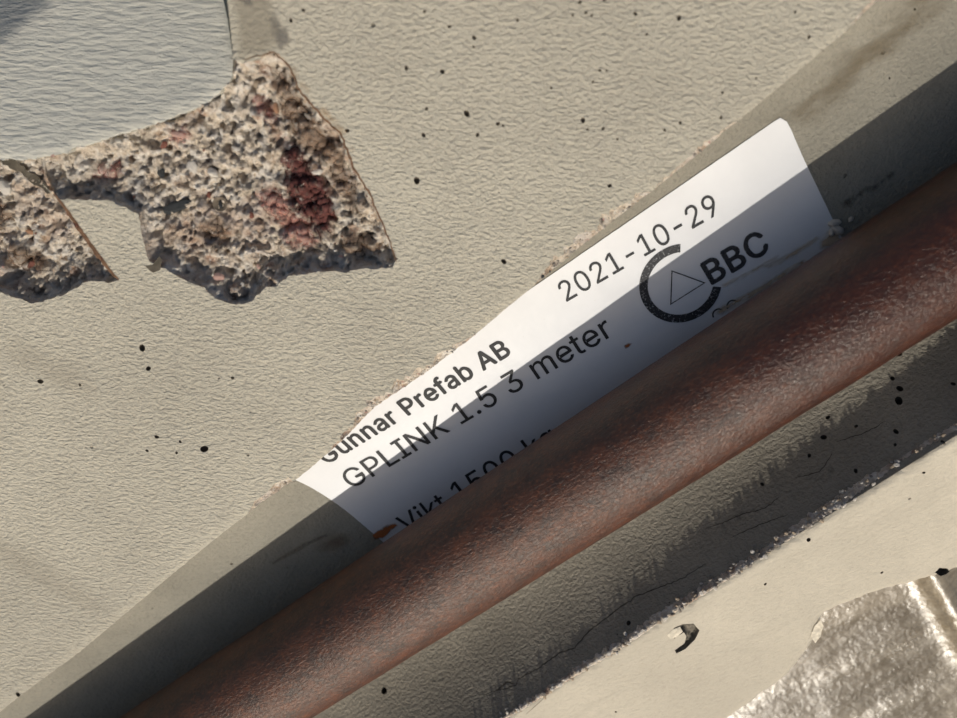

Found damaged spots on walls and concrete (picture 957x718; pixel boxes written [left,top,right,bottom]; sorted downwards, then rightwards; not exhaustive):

rust [11,248,40,268]
spalling [0,51,398,305]
rust [261,75,351,245]
rust [373,524,397,539]
crack [480,564,705,696]
spalling [499,422,957,718]